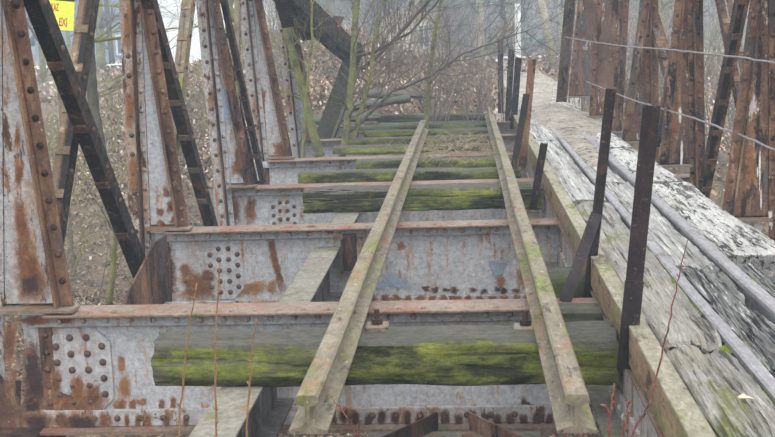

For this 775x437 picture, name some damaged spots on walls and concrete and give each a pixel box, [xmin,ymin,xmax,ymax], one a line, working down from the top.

rust [14,159,24,188]
rust [13,198,48,304]
rust [169,246,215,300]
rust [237,239,285,297]
rust [372,274,527,301]
rust [2,315,151,428]
rust [159,397,176,427]
rust [339,410,424,425]
rust [441,398,554,424]